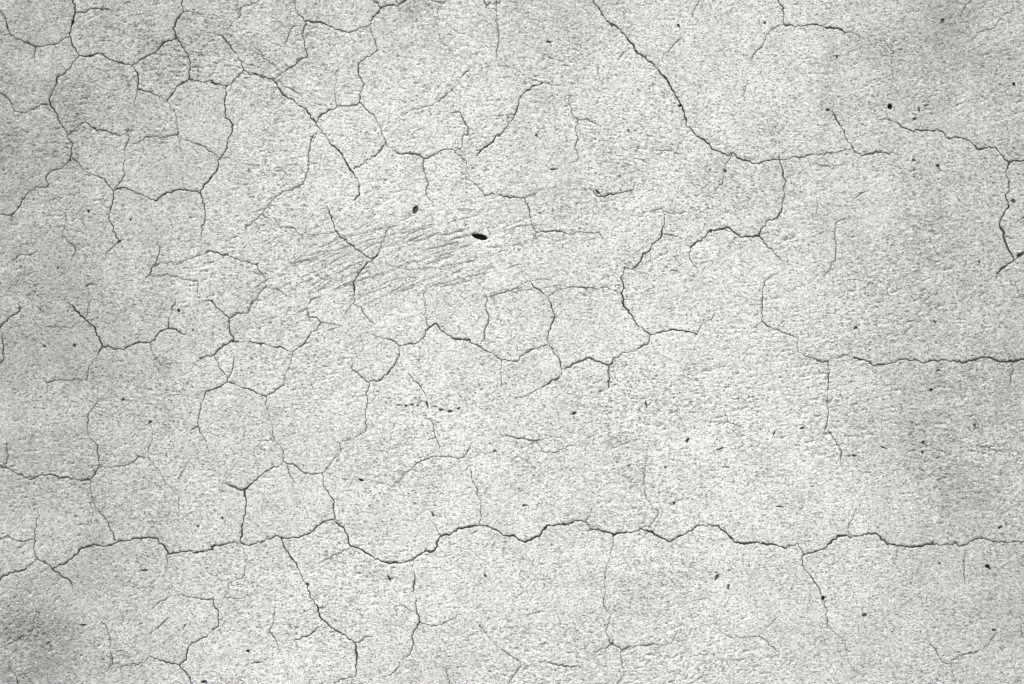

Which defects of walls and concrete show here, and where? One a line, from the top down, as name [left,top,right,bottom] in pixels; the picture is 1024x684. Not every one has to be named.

crack [0,0,604,263]
crack [0,205,1024,684]
crack [575,186,634,197]
crack [593,0,1024,463]